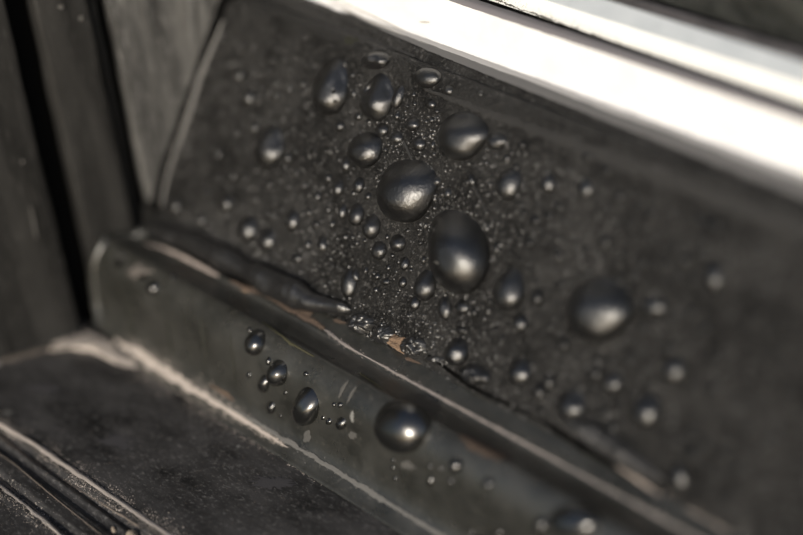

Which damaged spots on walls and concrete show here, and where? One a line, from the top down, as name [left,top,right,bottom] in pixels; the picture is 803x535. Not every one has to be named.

mould [496,0,650,54]
peeling [399,336,426,357]
damp [338,380,357,439]